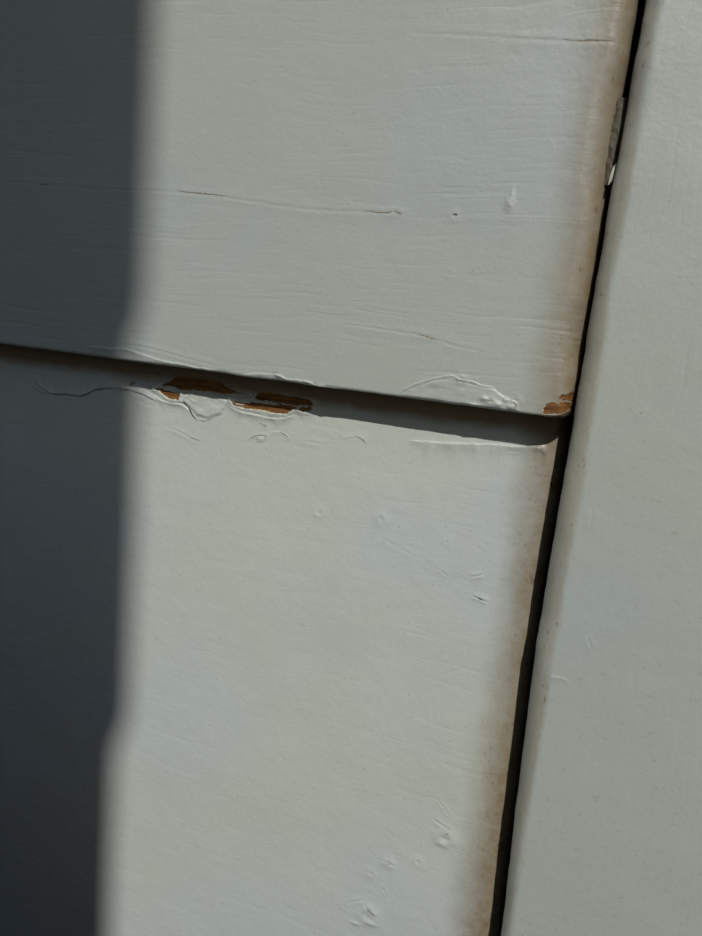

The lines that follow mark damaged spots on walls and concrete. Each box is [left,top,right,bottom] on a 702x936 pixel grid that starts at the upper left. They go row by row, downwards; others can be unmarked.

crack [35,366,163,409]
peeling [88,337,340,431]
peeling [396,367,578,418]